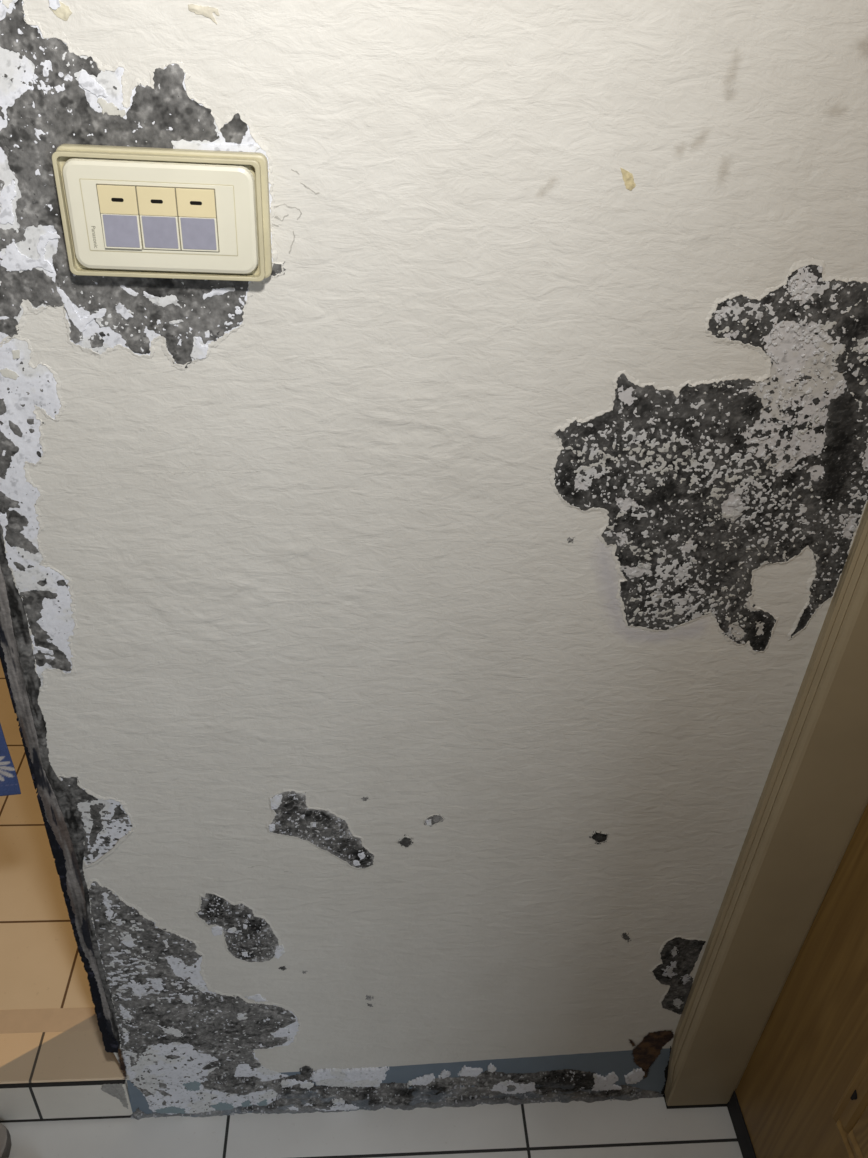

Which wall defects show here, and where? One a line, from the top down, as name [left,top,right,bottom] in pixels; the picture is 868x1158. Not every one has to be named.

peeling [0,0,664,1120]
flaking render [549,258,868,654]
corrosion [629,1030,673,1079]
flaking render [649,935,707,1015]